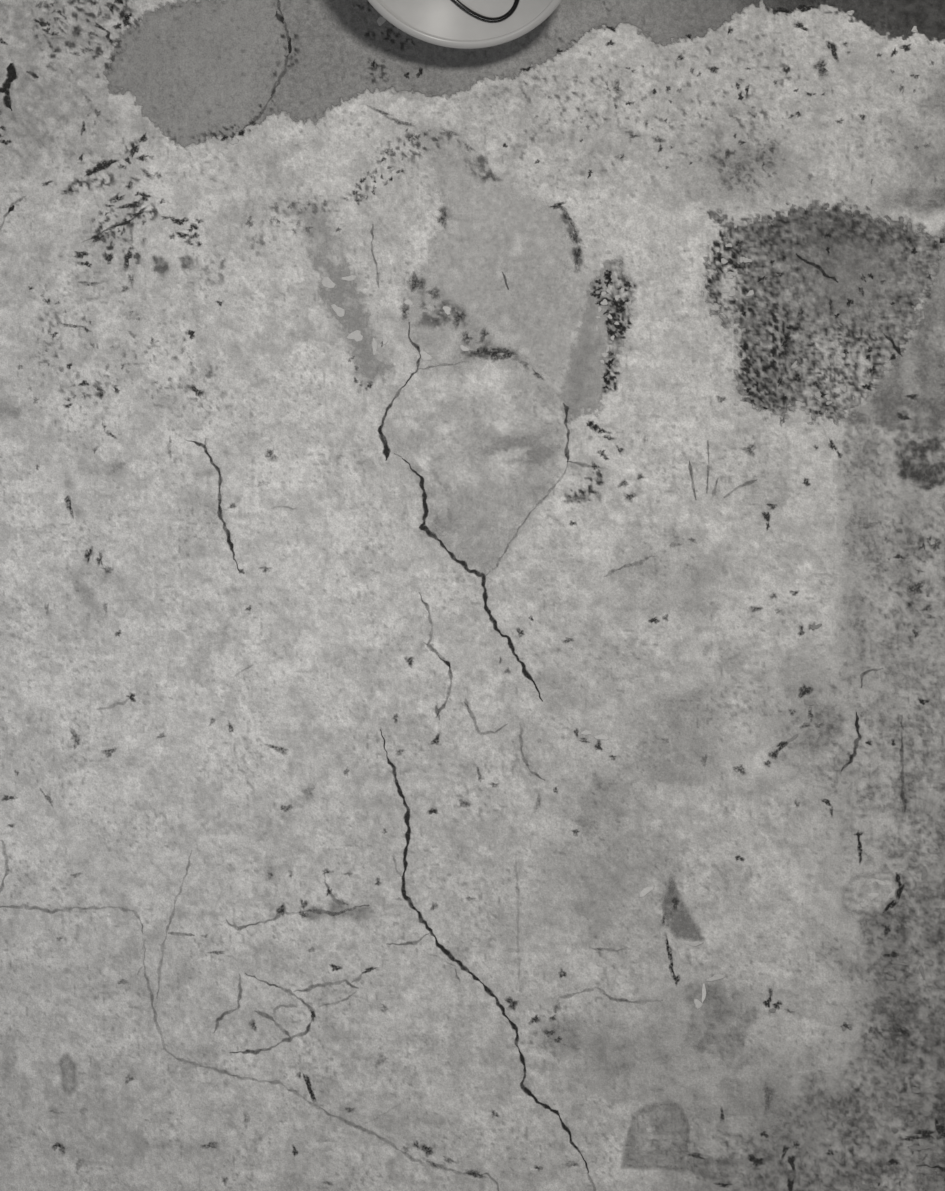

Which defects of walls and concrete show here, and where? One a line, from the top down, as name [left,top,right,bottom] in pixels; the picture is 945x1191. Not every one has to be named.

flaking render [35,0,945,291]
crack [184,437,244,574]
peeling [294,219,393,388]
crack [378,322,543,702]
water stain [844,285,945,490]
water stain [863,675,945,944]
crack [380,730,589,1173]
water stain [838,986,945,1191]